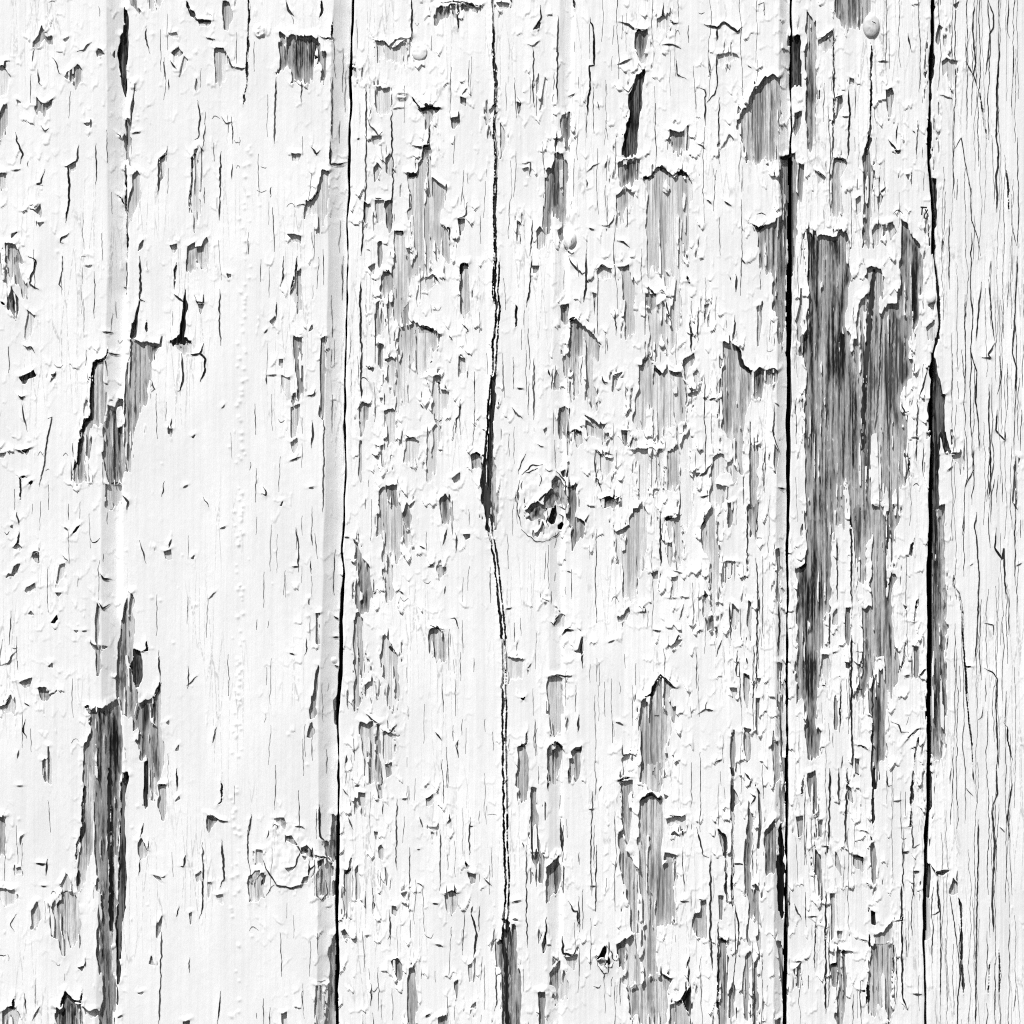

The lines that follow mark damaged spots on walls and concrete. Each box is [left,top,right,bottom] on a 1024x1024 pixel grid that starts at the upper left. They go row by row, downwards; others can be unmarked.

peeling [71,290,204,511]
peeling [276,27,333,88]
crack [0,0,799,1024]
peeling [333,97,478,817]
peeling [466,360,502,542]
peeling [515,111,575,255]
peeling [543,8,783,641]
peeling [692,0,965,1024]
crack [786,0,1024,1024]
peeling [30,589,180,1024]
peeling [374,831,410,916]
peeling [608,672,698,1024]